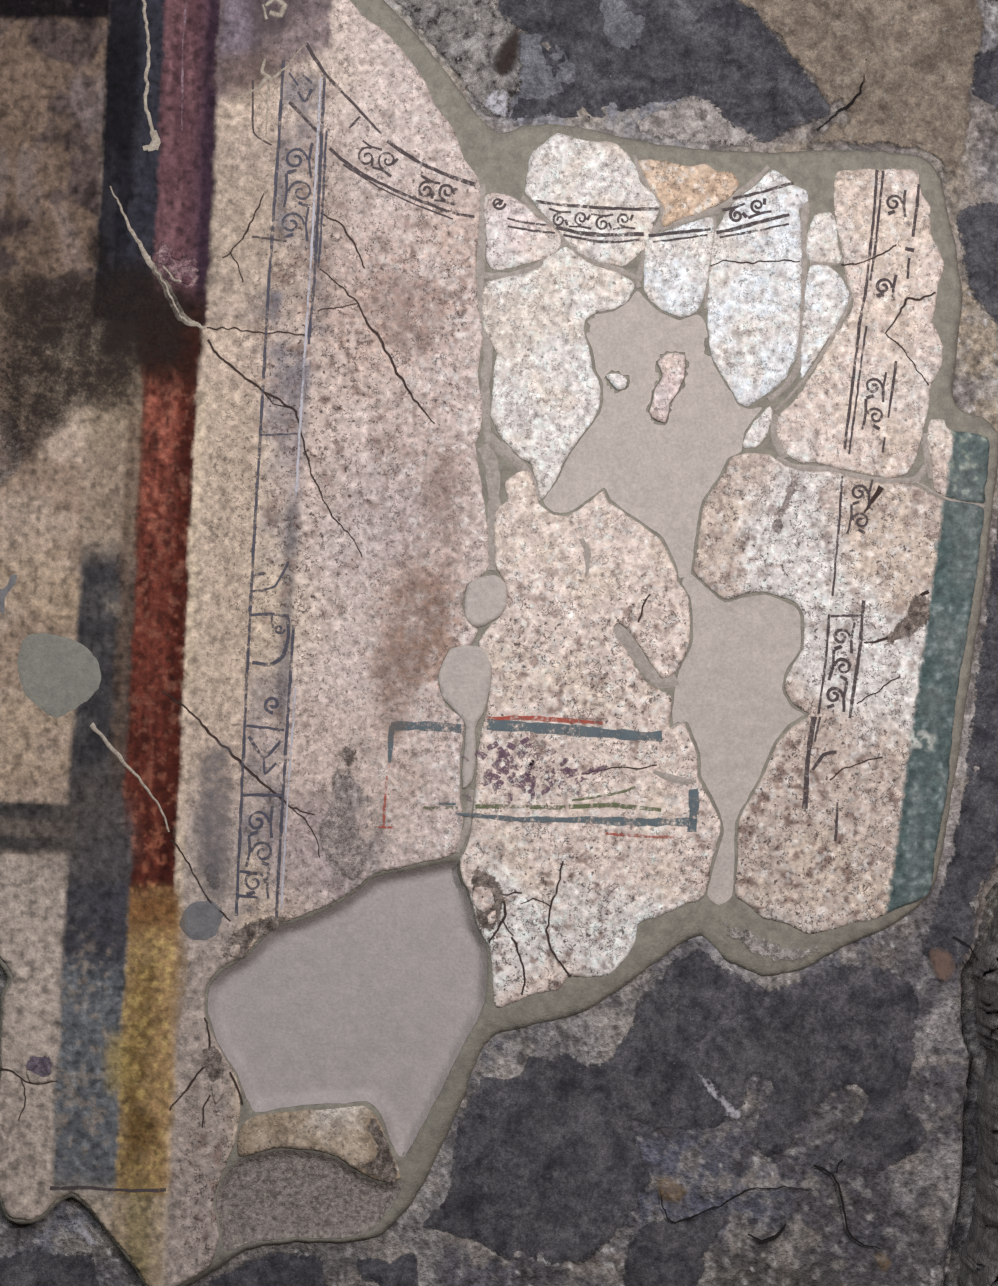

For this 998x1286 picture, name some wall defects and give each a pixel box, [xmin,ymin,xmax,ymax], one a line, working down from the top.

crack [817,59,867,131]
crack [145,213,435,557]
crack [476,155,985,570]
crack [579,538,591,577]
crack [162,691,320,858]
flaking render [198,746,504,1251]
crack [488,861,571,995]
crack [659,1159,880,1249]